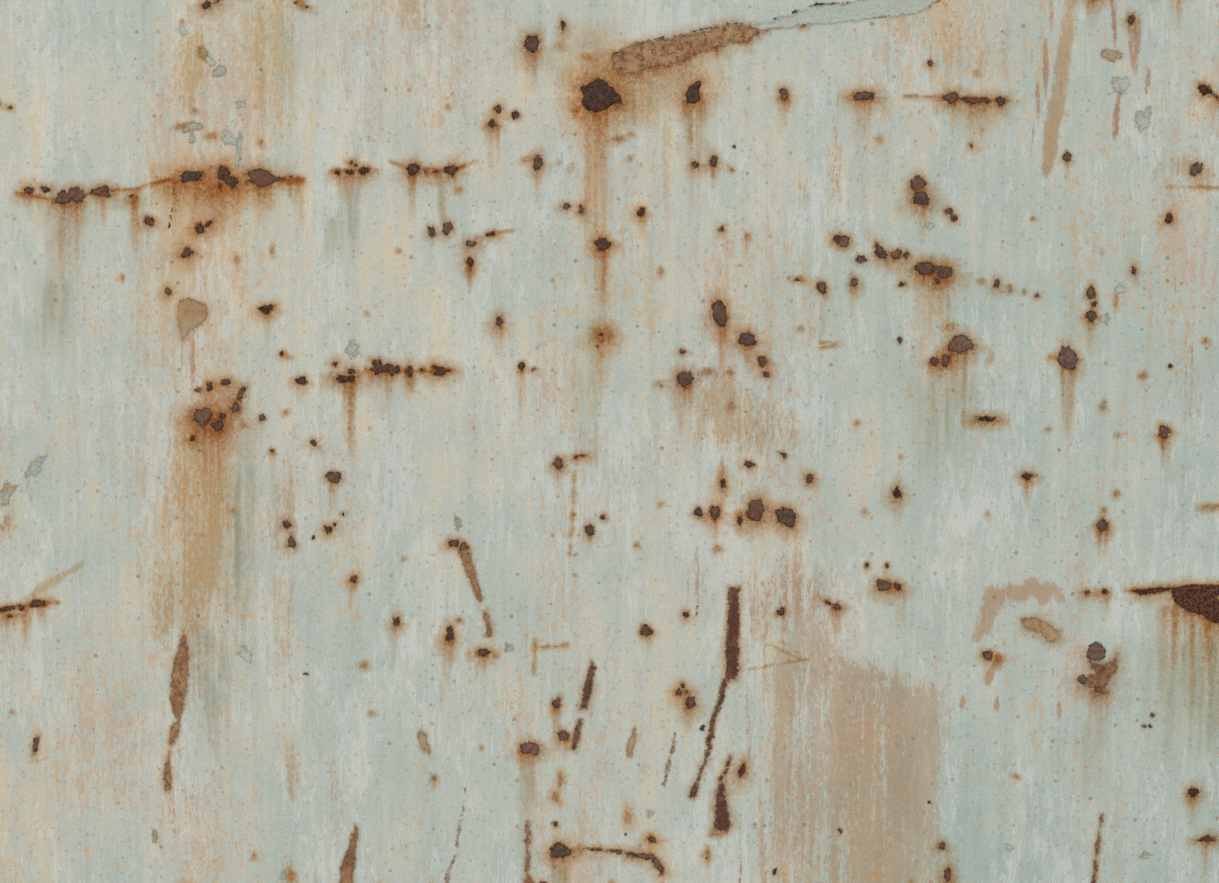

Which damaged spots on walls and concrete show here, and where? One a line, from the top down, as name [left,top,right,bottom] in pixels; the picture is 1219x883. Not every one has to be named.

peeling [612,0,940,74]
corrosion [580,78,621,112]
corrosion [180,166,292,188]
corrosion [24,185,111,204]
corrosion [833,235,952,284]
corrosion [190,379,246,441]
corrosion [0,599,45,618]
corrosion [1134,584,1219,623]
corrosion [549,842,572,858]